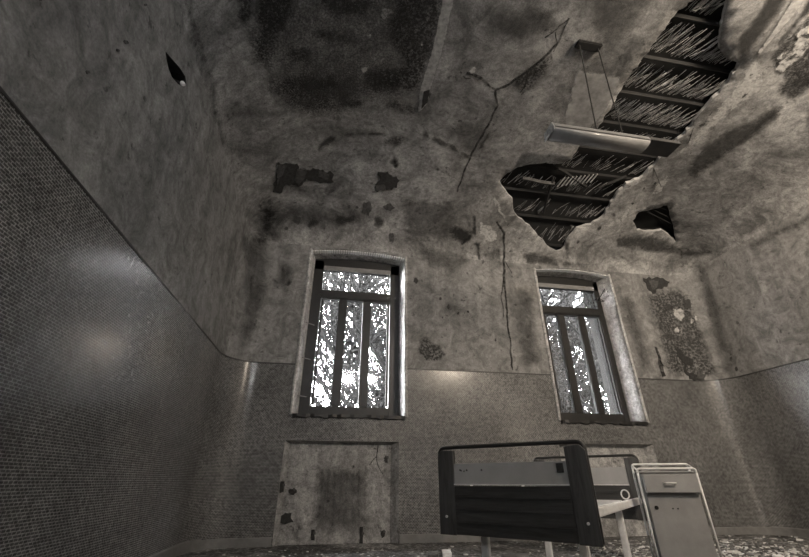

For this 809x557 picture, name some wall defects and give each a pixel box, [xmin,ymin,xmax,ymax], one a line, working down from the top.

spalling [165,53,186,86]
damp [238,0,439,113]
crack [457,18,570,192]
peeling [680,63,762,154]
peeling [772,19,809,75]
spalling [273,162,334,194]
spalling [375,172,400,192]
crack [496,221,513,370]